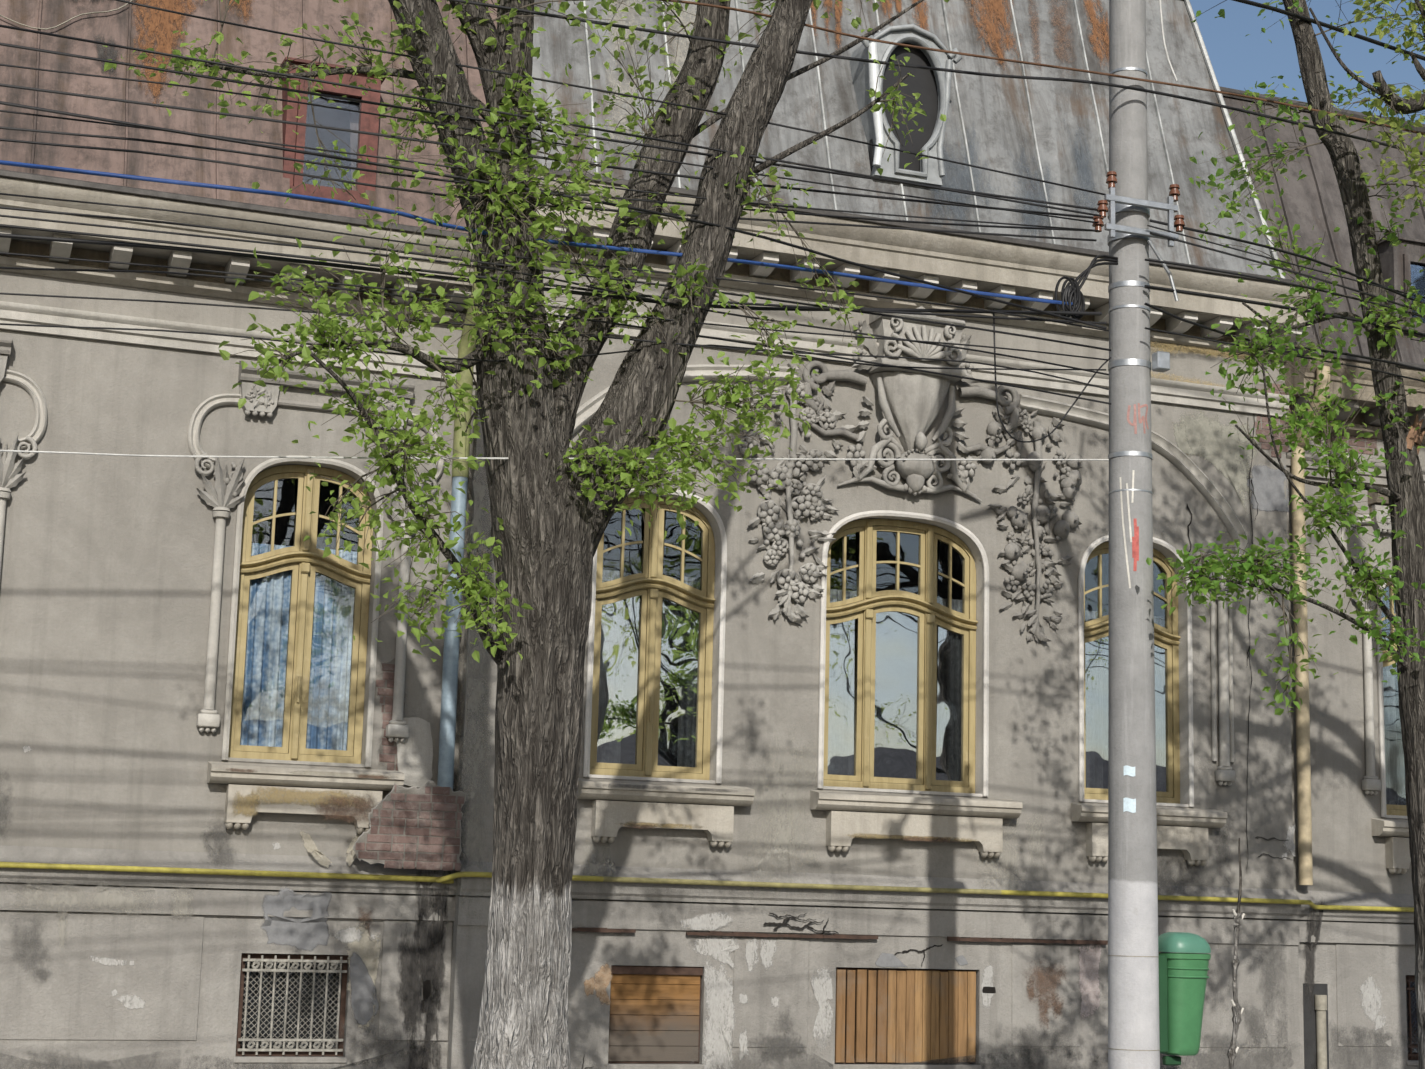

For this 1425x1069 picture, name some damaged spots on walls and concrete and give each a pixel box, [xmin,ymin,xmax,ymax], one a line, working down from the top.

corrosion [133,0,203,100]
corrosion [811,0,843,47]
corrosion [965,0,1017,63]
corrosion [1030,0,1071,68]
corrosion [1084,0,1109,66]
peeling [327,922,382,1029]
leakage [398,871,449,1069]
flaking render [584,963,612,1005]
peeling [681,912,777,1069]
crack [763,913,839,939]
flaking render [811,969,833,1047]
crack [895,945,942,967]